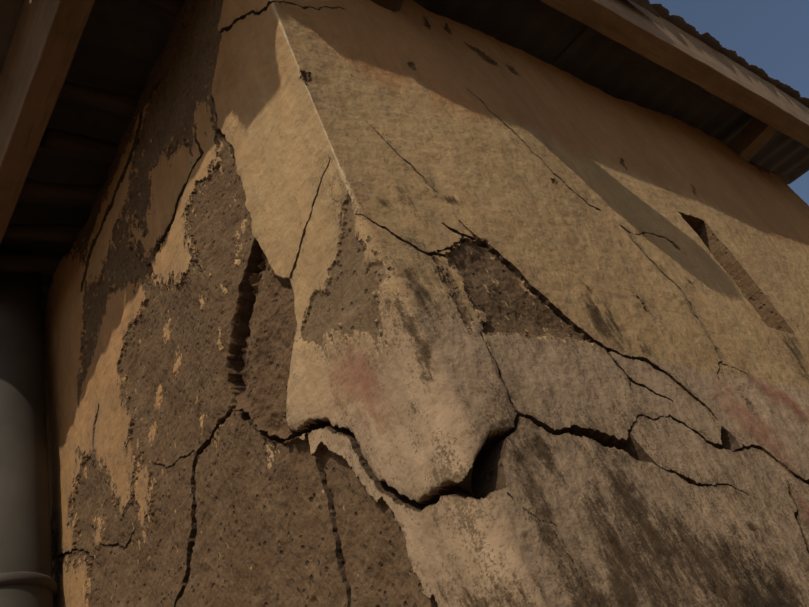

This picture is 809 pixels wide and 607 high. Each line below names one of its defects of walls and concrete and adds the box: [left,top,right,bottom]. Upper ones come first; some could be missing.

crack [219,1,345,33]
crack [52,530,135,574]
crack [92,404,114,501]
spalling [50,0,438,607]
crack [147,83,601,607]
spalling [432,236,595,346]
crack [355,213,809,554]
leakage [487,422,809,607]